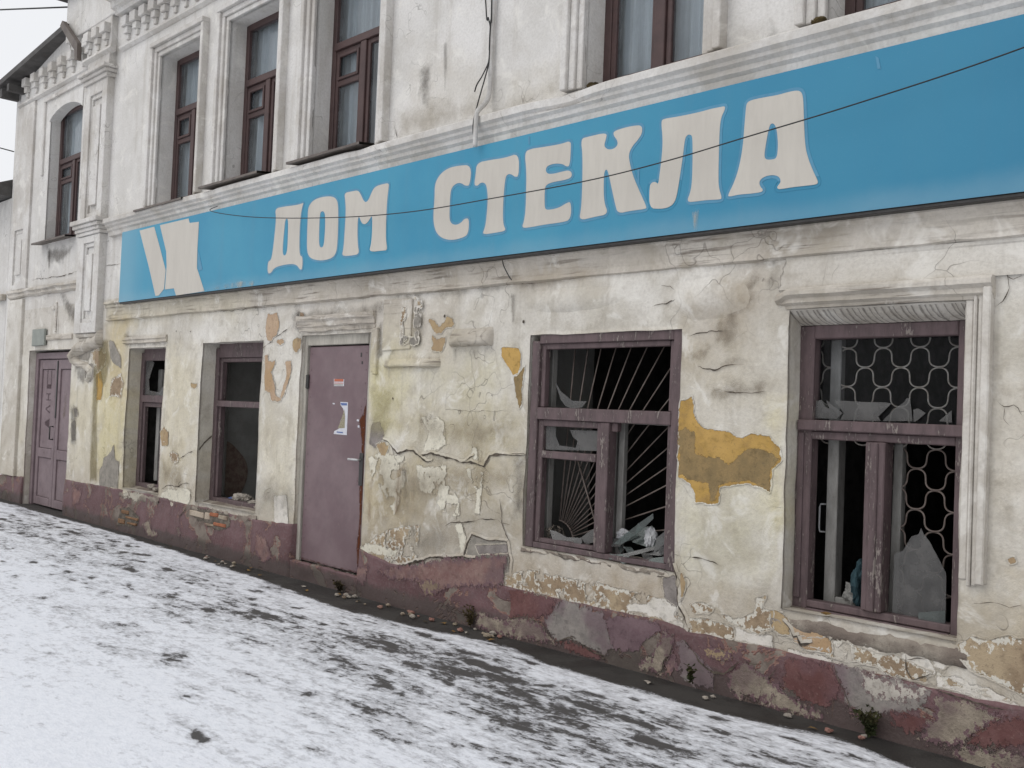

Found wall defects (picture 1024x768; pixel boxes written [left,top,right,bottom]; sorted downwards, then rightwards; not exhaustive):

peeling [399,296,455,353]
peeling [78,340,124,401]
peeling [264,312,302,403]
peeling [500,345,526,410]
crack [699,364,766,393]
peeling [160,427,179,464]
crack [383,437,526,467]
peeling [676,395,783,505]
peeling [99,444,159,537]
peeling [357,414,1024,768]